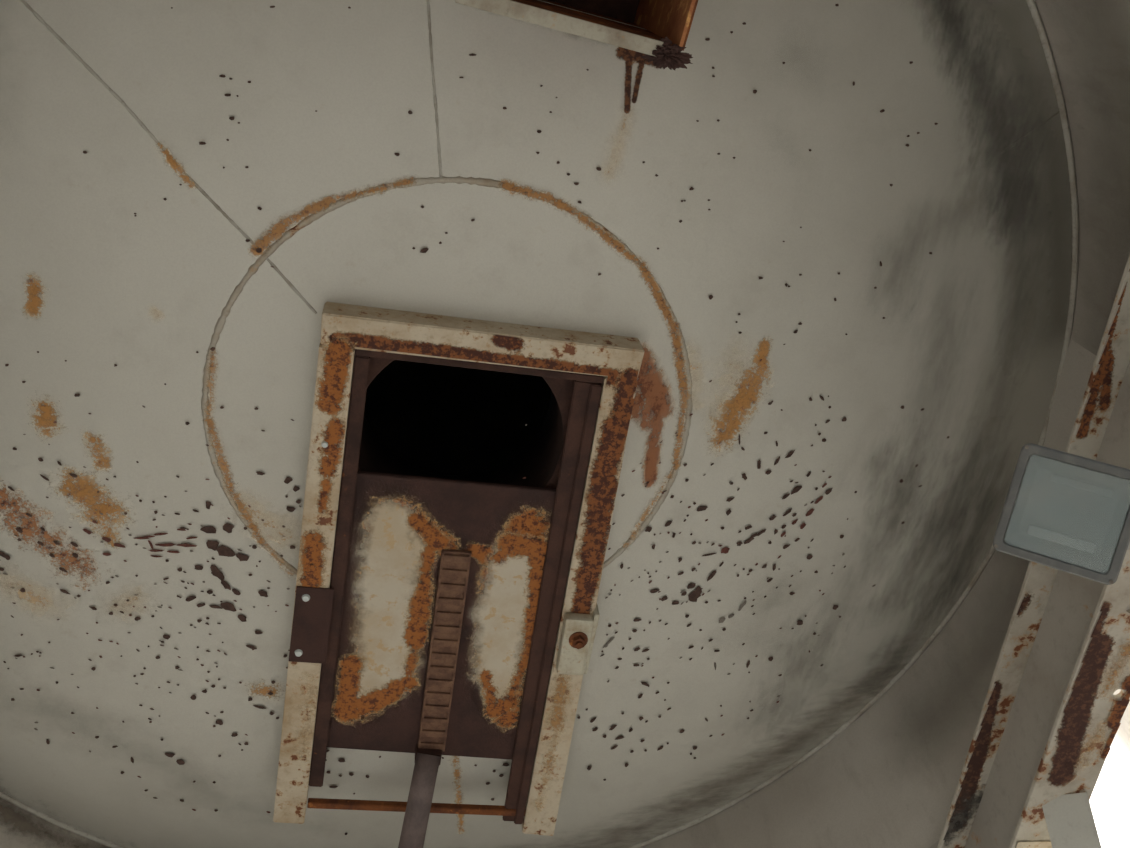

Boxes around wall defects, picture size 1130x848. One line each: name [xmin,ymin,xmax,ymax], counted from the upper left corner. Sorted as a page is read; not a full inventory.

rust [616,36,693,113]
rust [23,275,44,316]
rust [33,401,59,437]
rust [0,480,96,590]
rust [59,432,129,548]
rust [205,352,328,588]
rust [315,179,690,614]
rust [711,338,770,451]
rust [1076,269,1130,439]
rust [1017,594,1032,616]
rust [1047,602,1130,787]
rust [948,680,1002,829]